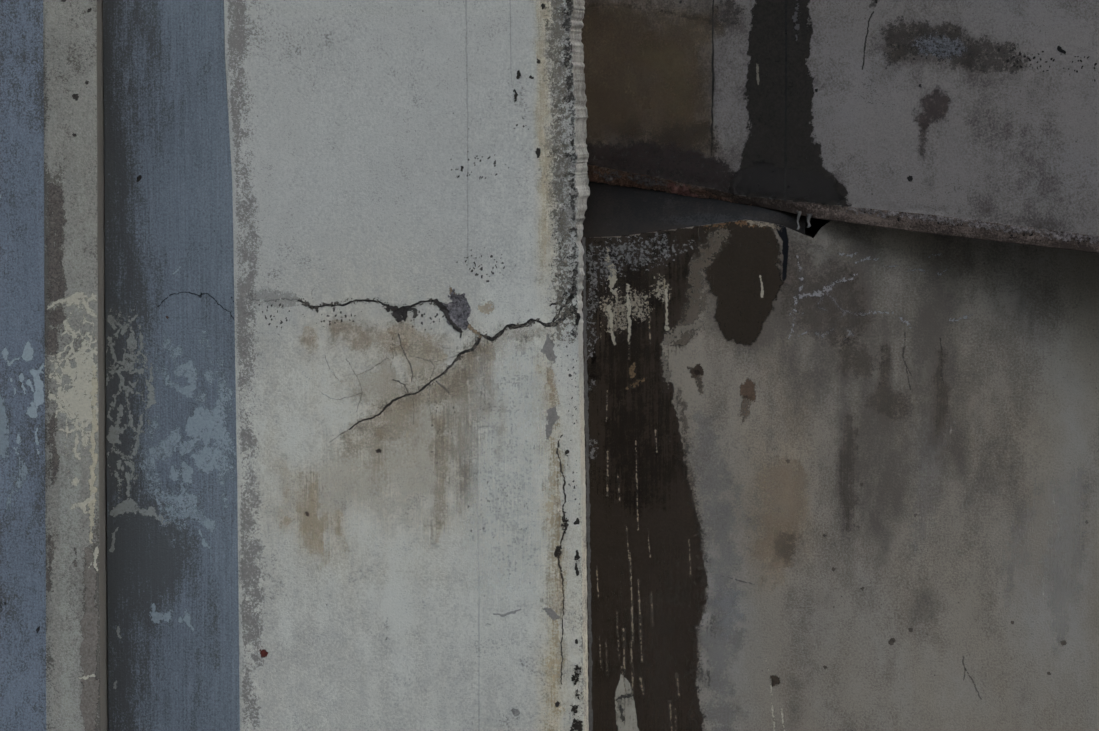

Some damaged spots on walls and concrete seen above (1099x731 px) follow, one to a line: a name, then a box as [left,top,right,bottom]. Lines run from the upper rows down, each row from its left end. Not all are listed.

crack [862,0,878,70]
water stain [729,0,852,207]
corrosion [703,220,782,230]
crack [157,292,234,319]
water stain [788,252,947,339]
crack [298,287,581,430]
water stain [543,0,784,731]
peeling [47,413,60,485]
peeling [46,534,56,592]
crack [554,434,569,684]